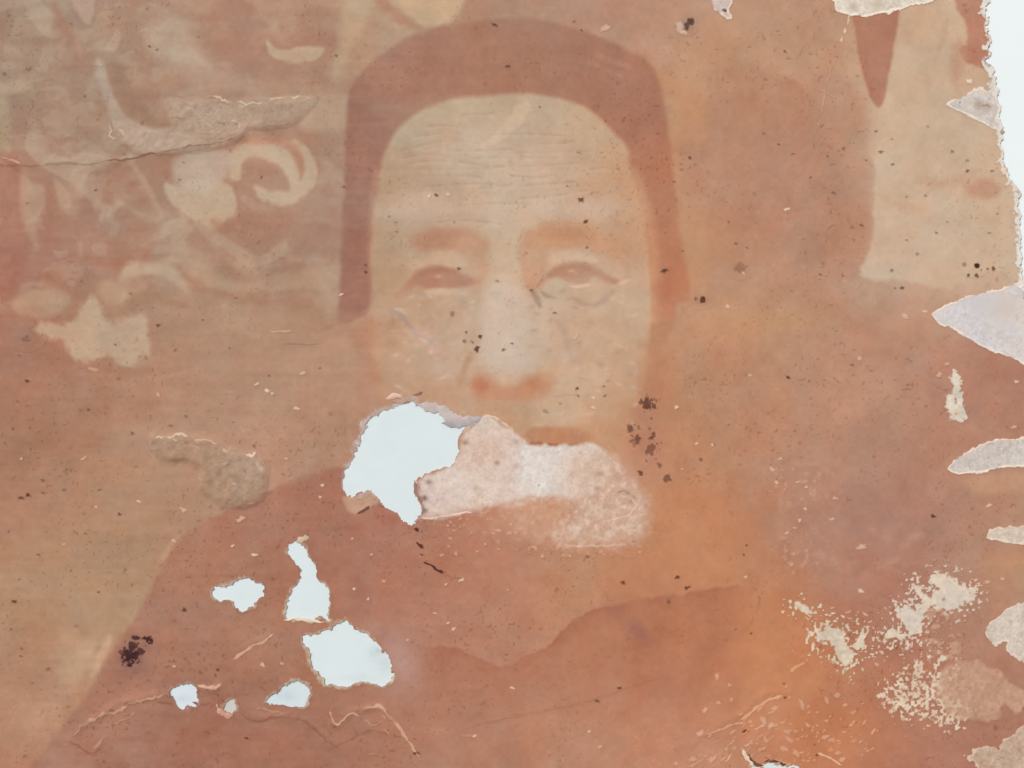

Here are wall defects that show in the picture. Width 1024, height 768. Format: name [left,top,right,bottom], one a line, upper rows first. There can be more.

peeling [831,0,936,18]
crack [0,136,237,167]
peeling [922,281,1024,365]
peeling [936,362,969,424]
flaking render [342,400,474,526]
peeling [947,425,1024,475]
peeling [986,525,1024,545]
flaking render [212,577,264,612]
flaking render [285,541,395,687]
peeling [740,558,1024,768]
flaking render [170,683,199,709]
flaking render [266,681,310,707]